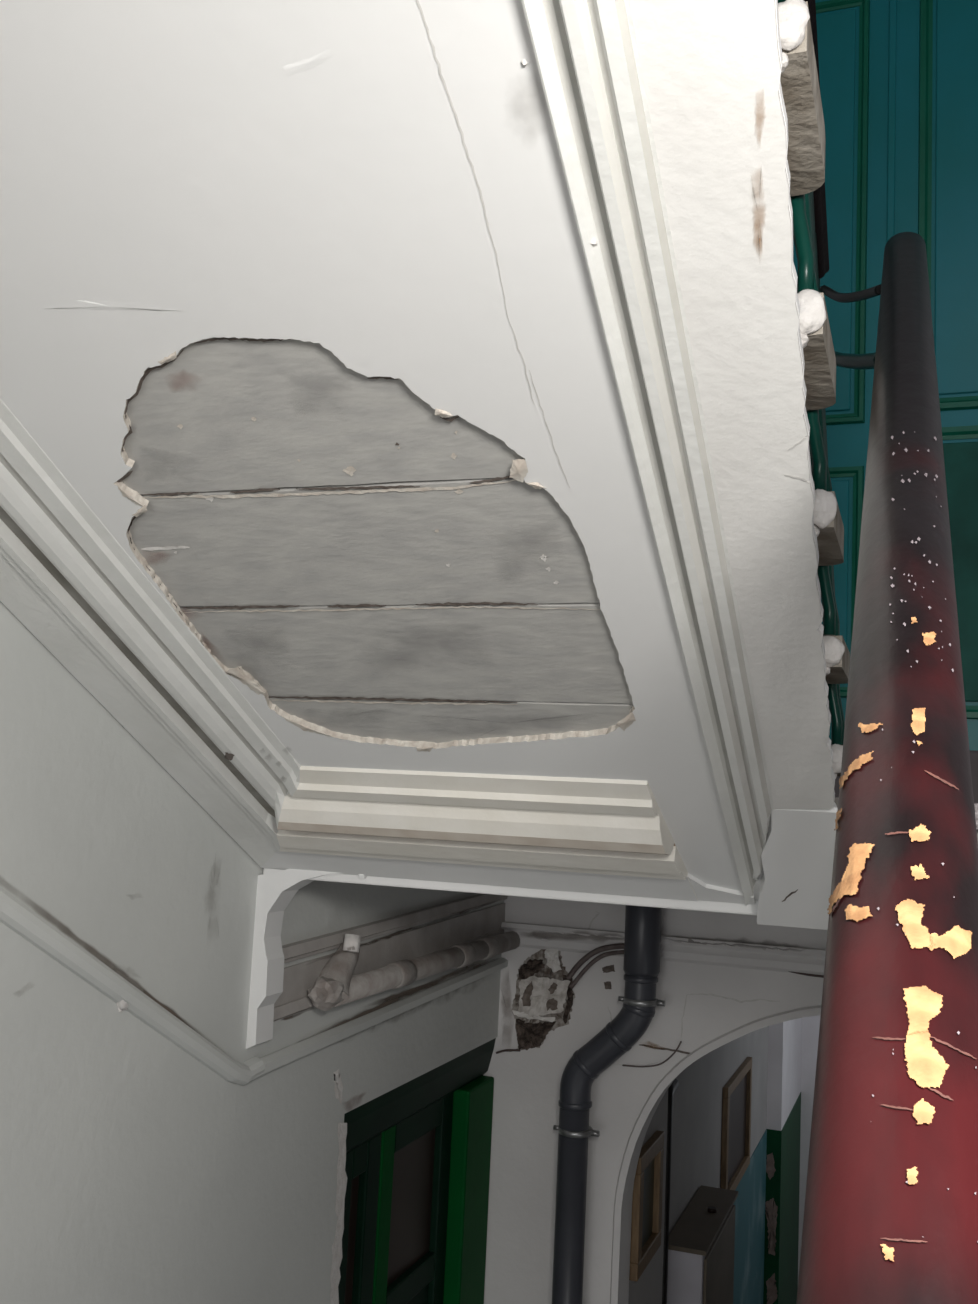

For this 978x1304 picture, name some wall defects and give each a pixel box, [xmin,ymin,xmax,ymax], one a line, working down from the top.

crack [416,0,570,488]
spalling [116,337,636,752]
peeling [911,617,936,645]
peeling [911,708,926,746]
peeling [909,824,931,842]
peeling [827,843,875,922]
peeling [911,864,929,880]
peeling [895,899,972,959]
spalling [511,949,575,1050]
peeling [903,986,949,1124]
peeling [907,1167,918,1184]
peeling [880,1244,894,1261]